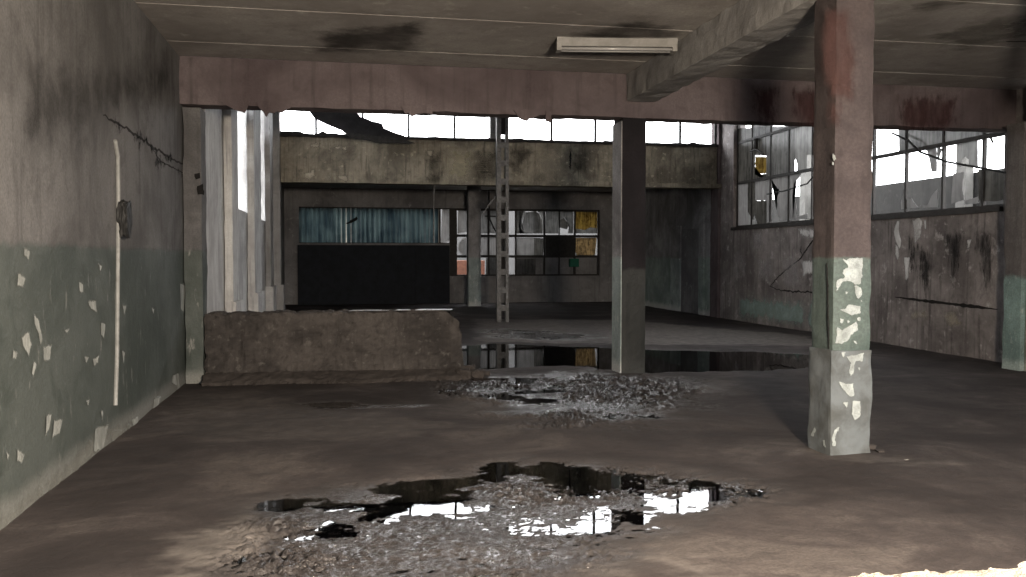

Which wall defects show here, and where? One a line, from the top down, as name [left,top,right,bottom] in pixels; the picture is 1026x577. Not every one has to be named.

water stain [894,218,930,291]
water stain [946,234,991,284]
peeling [13,316,51,375]
peeling [79,282,105,338]
peeling [835,258,864,420]
spalling [37,411,138,496]